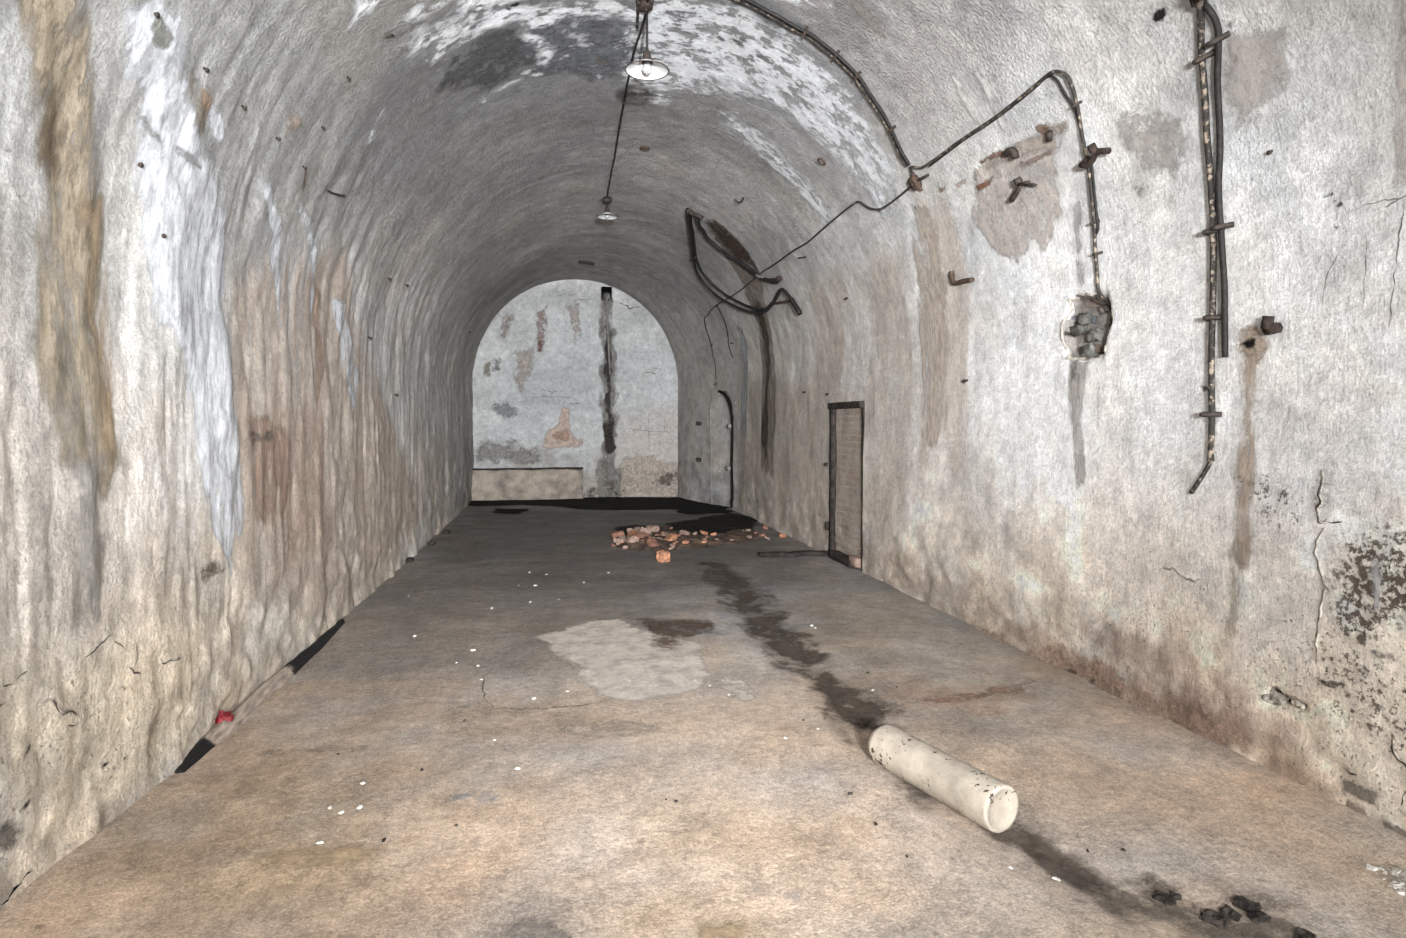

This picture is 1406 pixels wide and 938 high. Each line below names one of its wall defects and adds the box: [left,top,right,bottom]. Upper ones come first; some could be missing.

water stain [349,0,379,28]
water stain [410,0,897,225]
water stain [19,0,116,623]
flaking render [939,123,1067,262]
spalling [1060,292,1113,362]
crack [1323,195,1406,323]
flaking render [543,407,583,449]
water stain [1231,474,1299,528]
crack [1313,470,1341,663]
water stain [1312,522,1406,770]